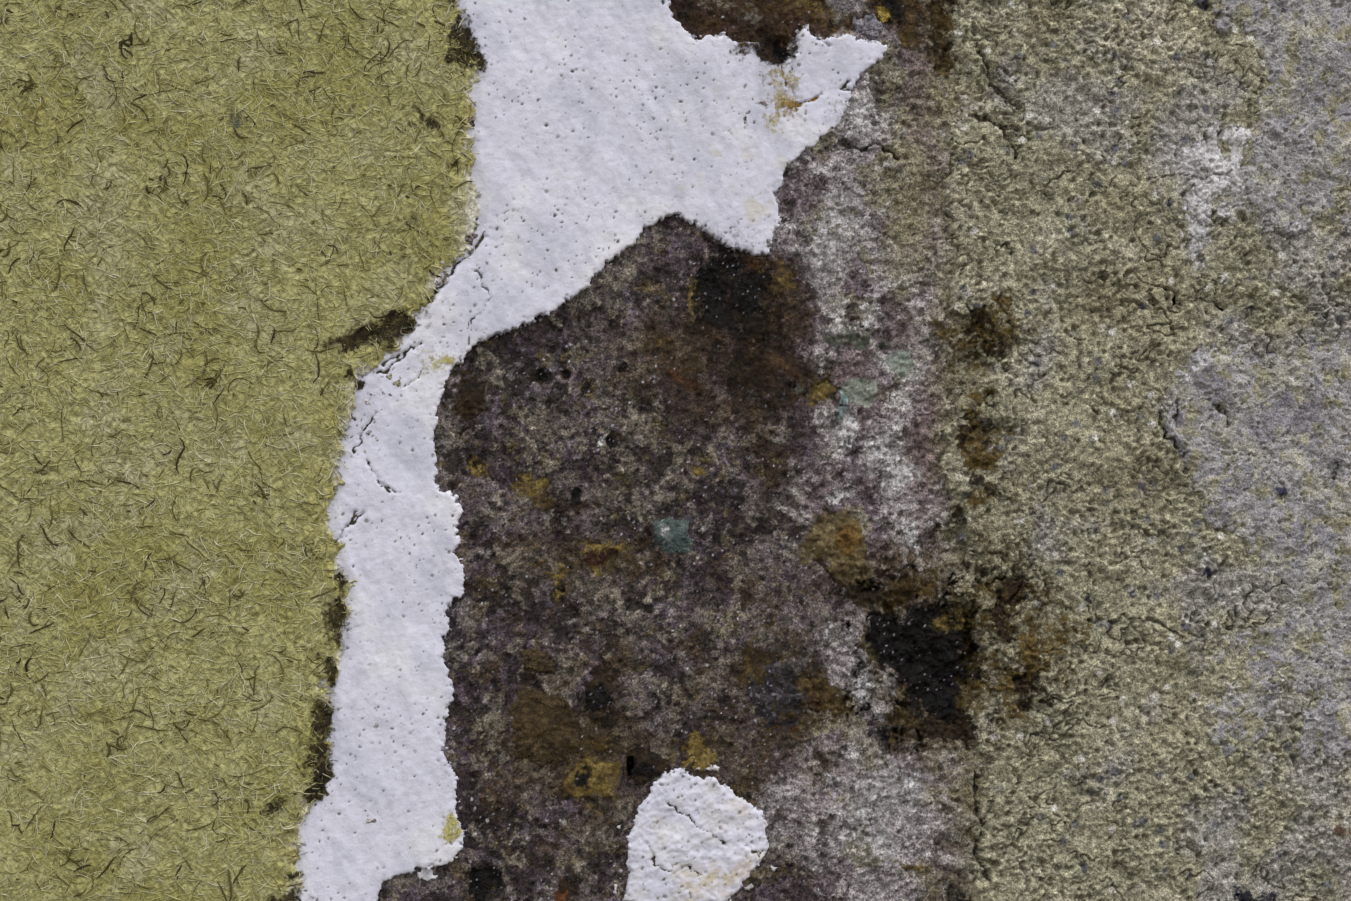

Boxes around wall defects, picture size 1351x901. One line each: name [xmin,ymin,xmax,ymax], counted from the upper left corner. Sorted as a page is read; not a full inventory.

spalling [669,0,932,61]
leakage [834,98,878,147]
leakage [685,155,865,397]
leakage [850,286,915,376]
spalling [377,214,853,901]
leakage [826,483,855,505]
leakage [833,391,924,499]
leakage [897,511,920,554]
leakage [736,567,915,749]
leakage [822,633,989,873]